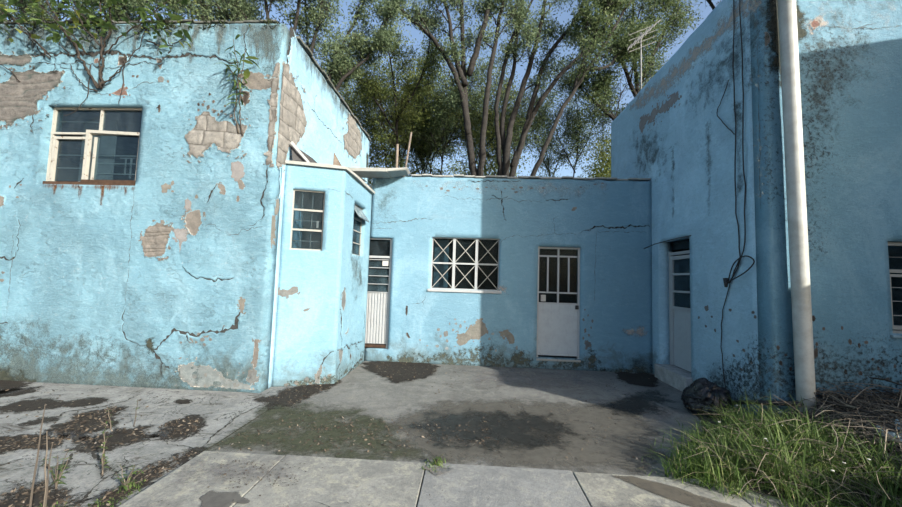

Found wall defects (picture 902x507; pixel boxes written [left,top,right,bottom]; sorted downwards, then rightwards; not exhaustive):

spalling [0,51,66,132]
spalling [182,60,310,202]
spalling [342,109,363,163]
water stain [630,0,781,110]
water stain [796,2,862,210]
crack [823,22,902,30]
spalling [138,195,206,261]
crack [440,178,651,301]
water stain [0,336,157,387]
crack [0,189,260,506]
peeling [406,318,522,353]
water stain [814,337,902,398]